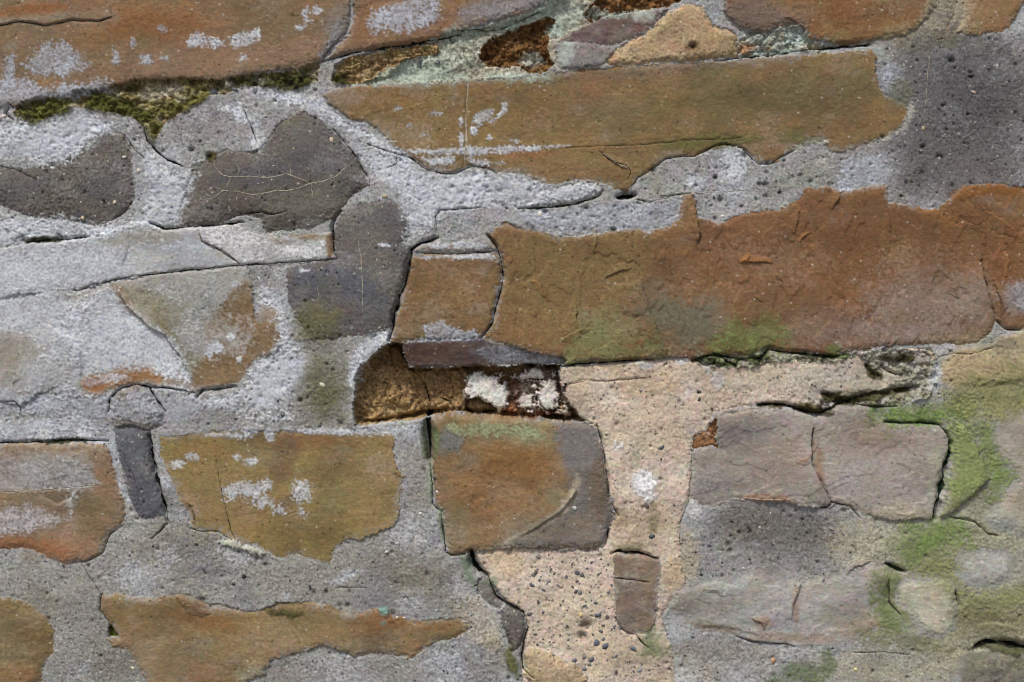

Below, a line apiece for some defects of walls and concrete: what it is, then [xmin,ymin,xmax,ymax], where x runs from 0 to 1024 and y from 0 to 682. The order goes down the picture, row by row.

water stain [218,102,265,150]
crack [78,77,497,306]
crack [757,364,997,536]
water stain [224,478,286,514]
water stain [292,479,310,514]